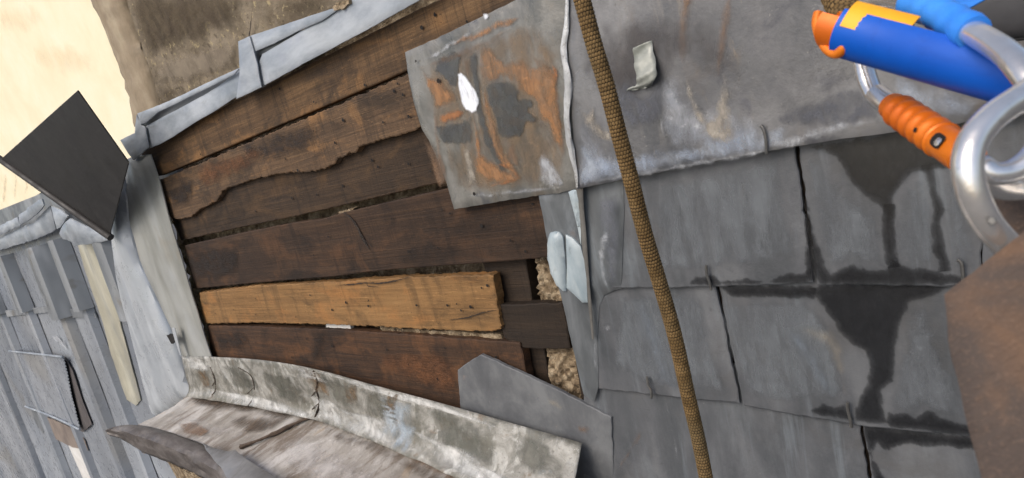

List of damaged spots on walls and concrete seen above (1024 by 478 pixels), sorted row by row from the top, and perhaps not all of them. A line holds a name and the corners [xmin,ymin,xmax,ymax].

rust [427,36,561,185]
water stain [606,29,799,267]
water stain [618,301,675,384]
water stain [674,299,721,388]
water stain [692,133,973,478]